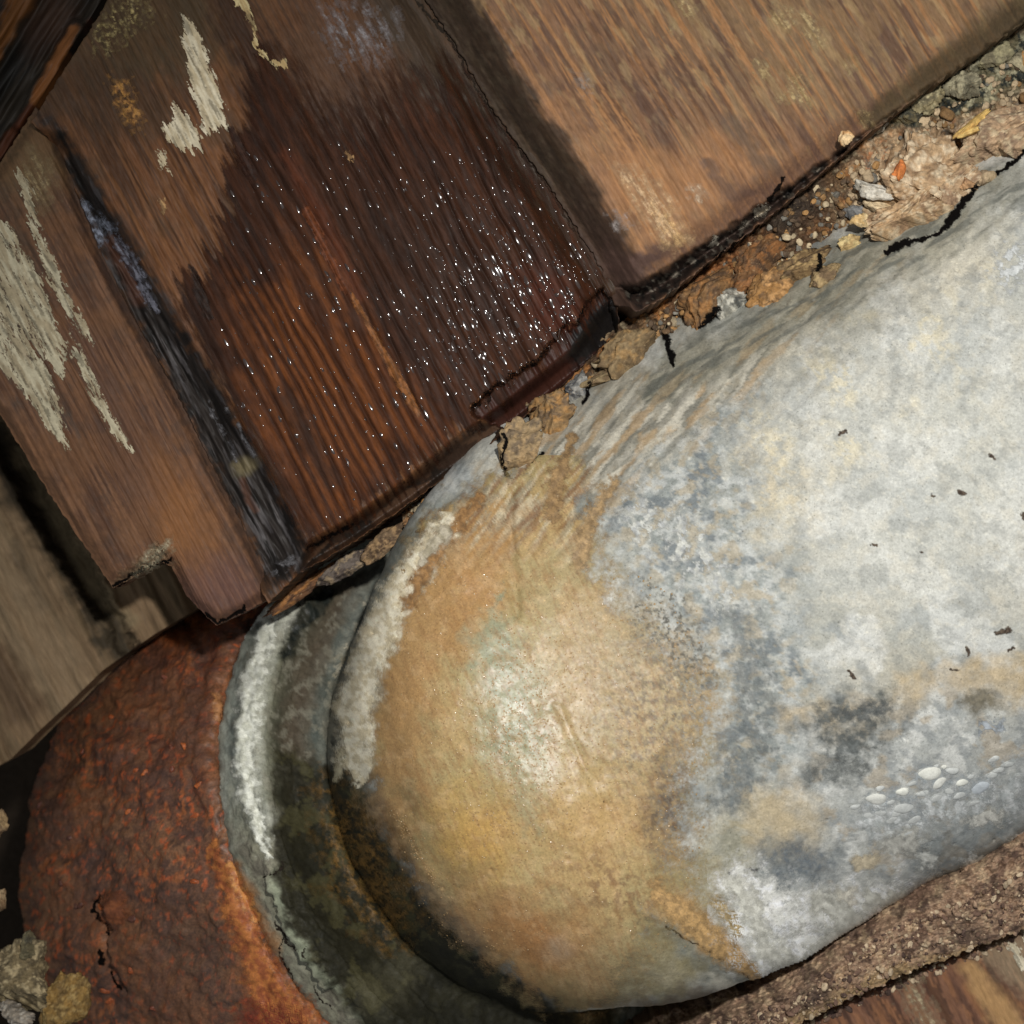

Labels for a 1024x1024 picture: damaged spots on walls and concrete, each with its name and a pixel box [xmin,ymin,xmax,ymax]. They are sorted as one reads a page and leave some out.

leakage [81,202,160,313]
leakage [175,40,611,555]
peeling [741,203,770,229]
spalling [842,200,891,228]
spalling [891,159,906,181]
corrosion [210,692,223,722]
leakage [219,586,333,860]
corrosion [346,432,761,1024]
leakage [803,691,890,788]
leakage [713,755,1024,977]
crack [90,894,122,990]
corrosion [206,838,318,1024]